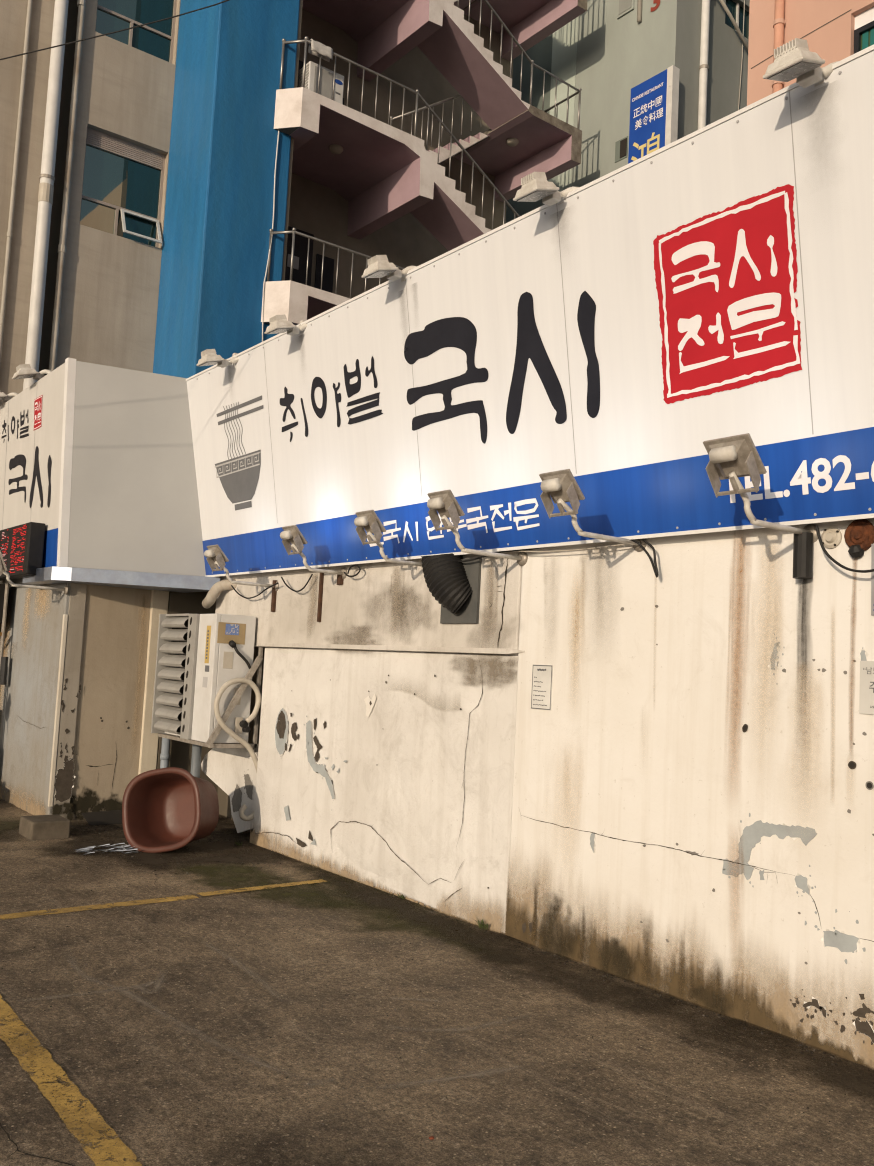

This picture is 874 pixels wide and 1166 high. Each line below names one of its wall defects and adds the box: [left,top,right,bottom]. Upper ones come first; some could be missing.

crack [489,563,507,646]
corrosion [735,546,743,705]
flaking render [54,729,77,802]
peeling [275,708,347,801]
crack [330,671,483,901]
damp [0,785,874,1099]
crack [521,815,821,925]
peeling [722,813,818,888]
peeling [795,865,866,964]
flaking render [790,989,874,1045]